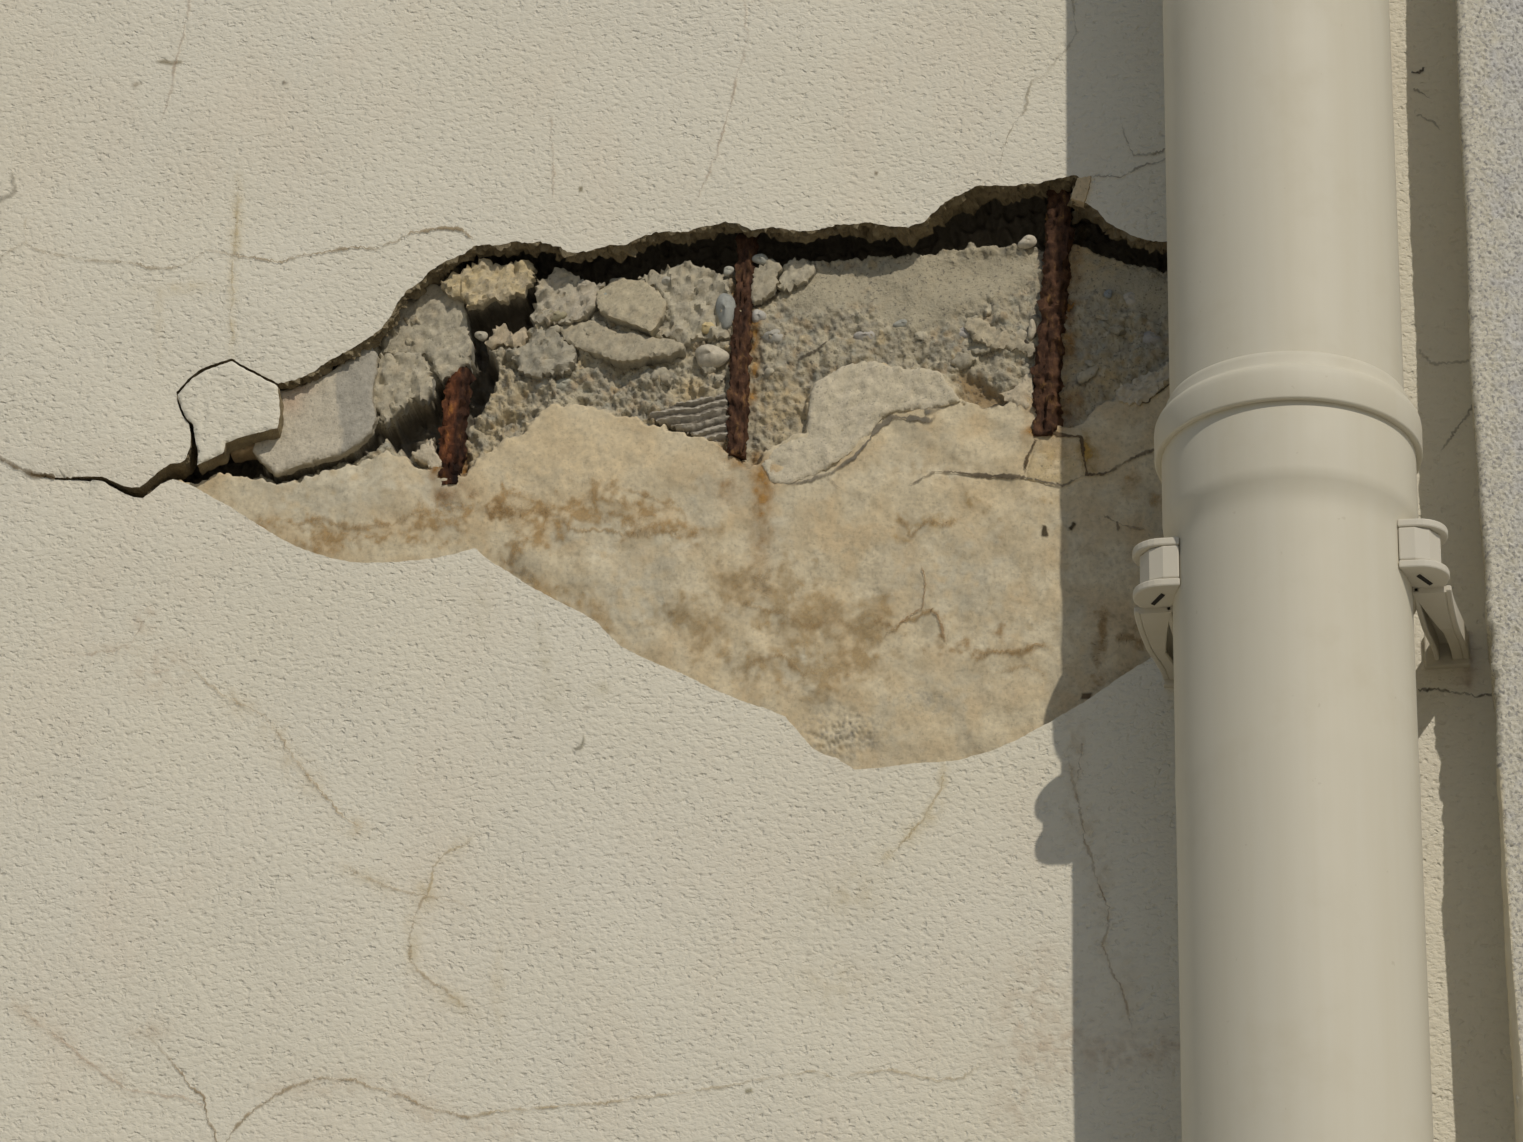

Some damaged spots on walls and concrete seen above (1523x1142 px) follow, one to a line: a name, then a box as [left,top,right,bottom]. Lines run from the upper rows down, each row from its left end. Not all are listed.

crack [233,226,472,263]
crack [1,458,55,479]
spalling [44,175,1170,770]
crack [175,1066,290,1142]
crack [457,1101,613,1118]